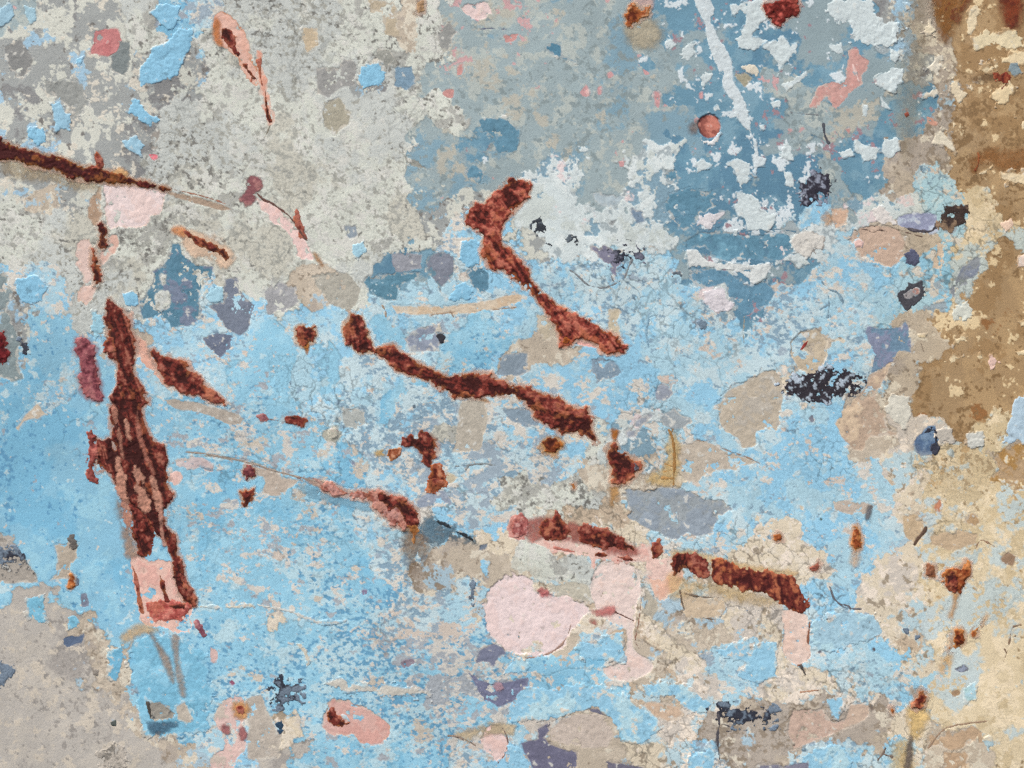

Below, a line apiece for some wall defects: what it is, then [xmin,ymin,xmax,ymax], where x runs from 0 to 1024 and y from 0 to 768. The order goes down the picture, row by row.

peeling [730,0,807,108]
peeling [809,0,936,110]
peeling [965,5,1024,129]
corrosion [0,136,225,204]
corrosion [464,177,628,357]
peeling [663,158,946,316]
corrosion [74,298,227,641]
corrosion [297,477,420,544]
corrosion [341,311,644,504]
corrosion [506,510,811,614]
peeling [834,320,1024,491]
peeling [105,629,218,742]